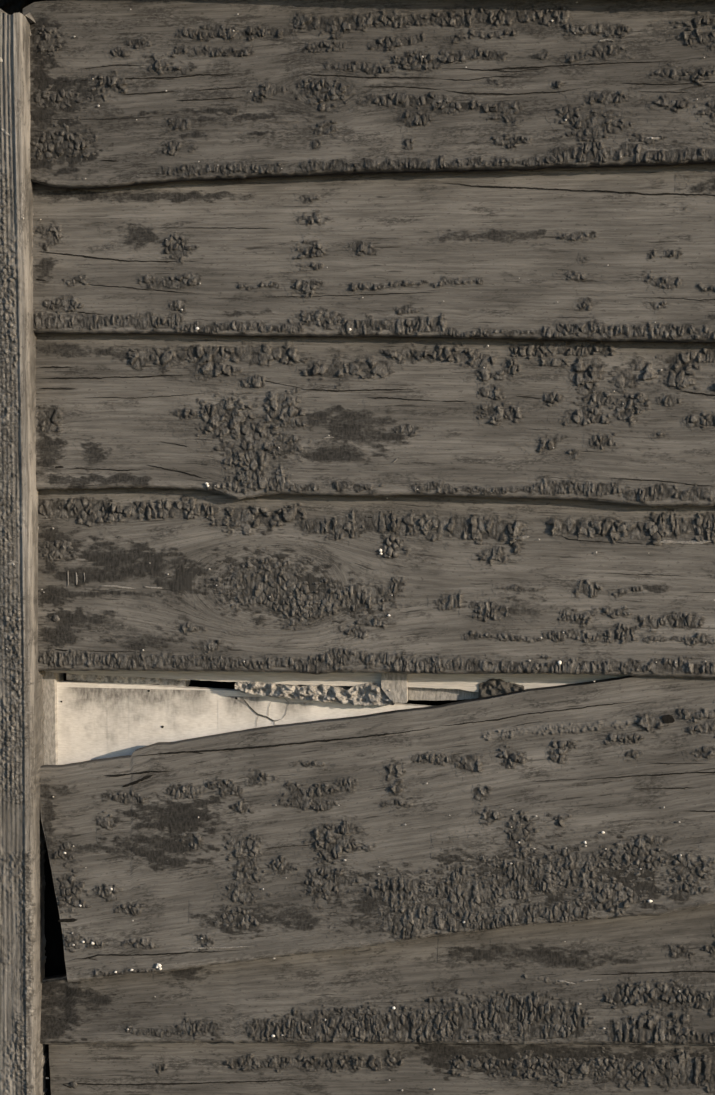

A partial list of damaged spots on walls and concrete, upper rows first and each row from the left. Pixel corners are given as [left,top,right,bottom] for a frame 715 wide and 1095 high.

crack [448,183,715,196]
crack [105,696,643,787]